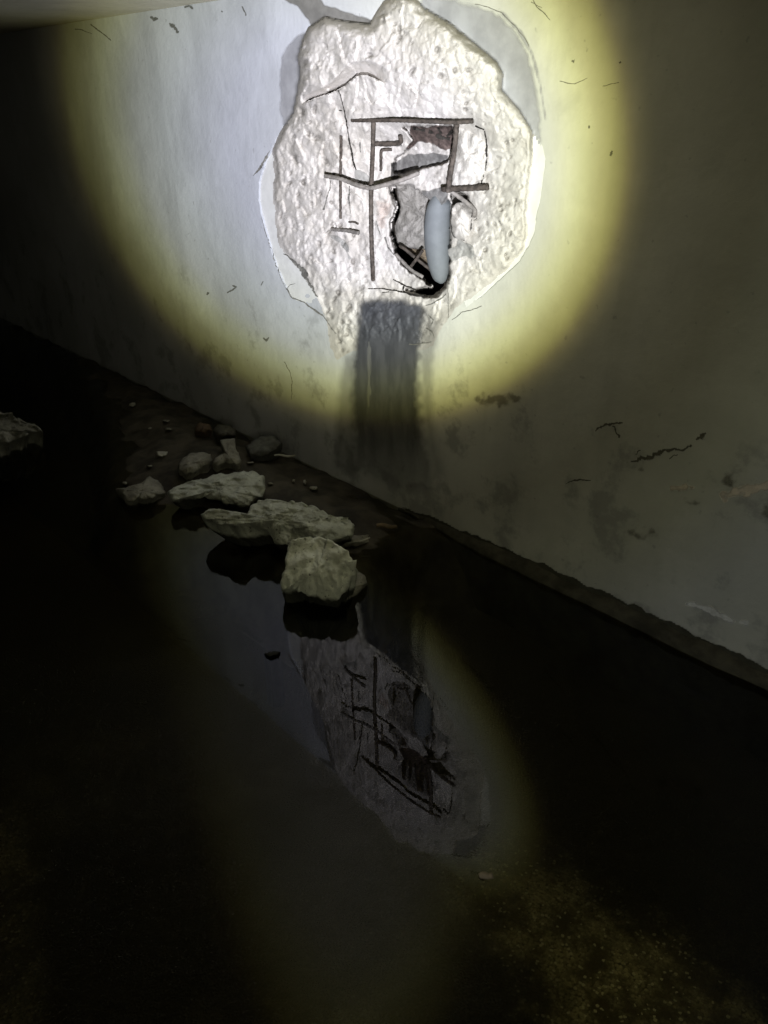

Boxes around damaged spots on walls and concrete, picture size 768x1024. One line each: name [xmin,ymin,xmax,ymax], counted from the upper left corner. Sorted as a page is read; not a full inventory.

spalling [253,0,546,365]
rust [407,125,453,150]
water stain [353,300,423,456]
crack [595,422,706,462]